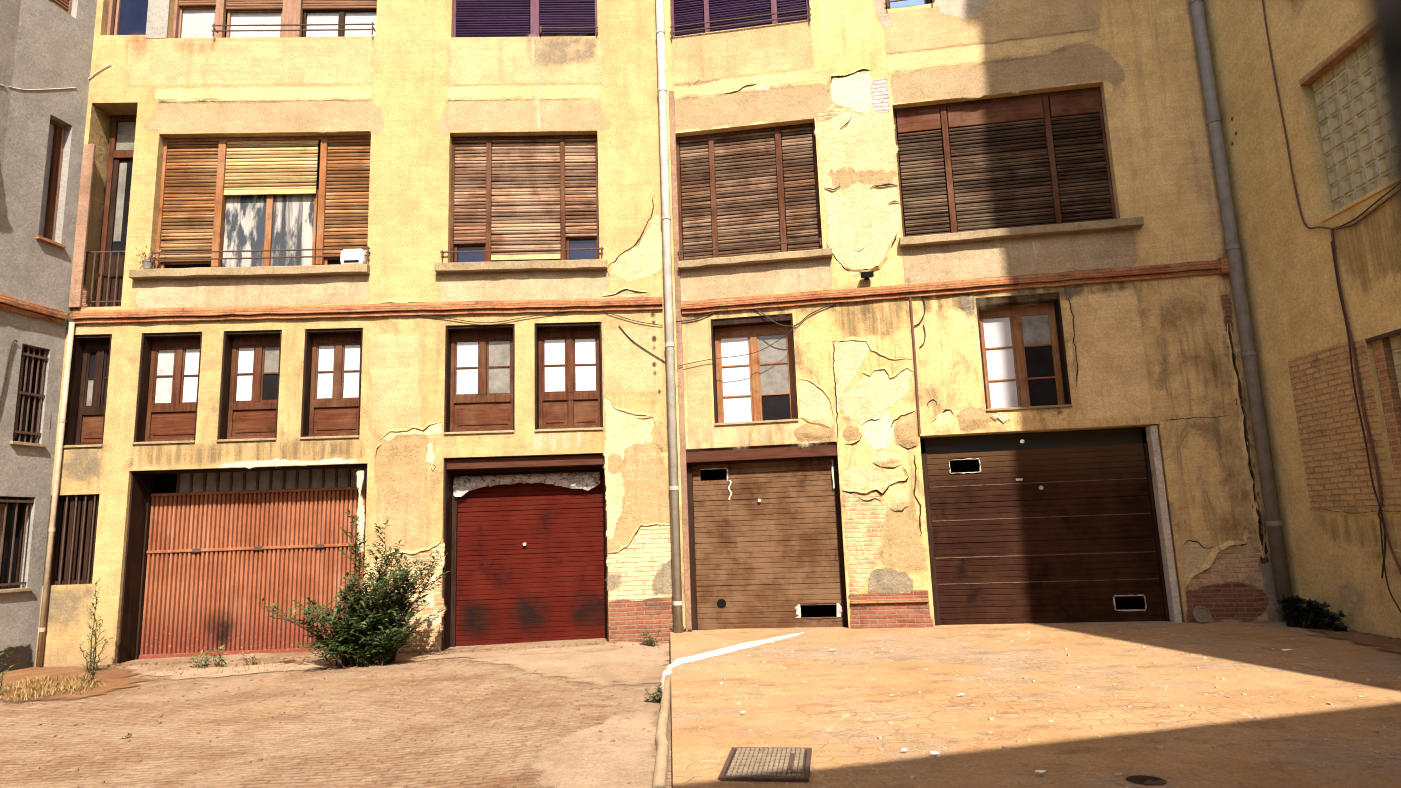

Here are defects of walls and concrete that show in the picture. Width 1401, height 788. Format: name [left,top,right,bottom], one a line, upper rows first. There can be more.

peeling [935,0,989,20]
peeling [814,67,902,275]
peeling [601,213,663,393]
flaking render [603,394,674,644]
peeling [798,336,914,451]
flaking render [842,466,934,629]
crack [1170,324,1269,566]
flaking render [1181,529,1281,623]